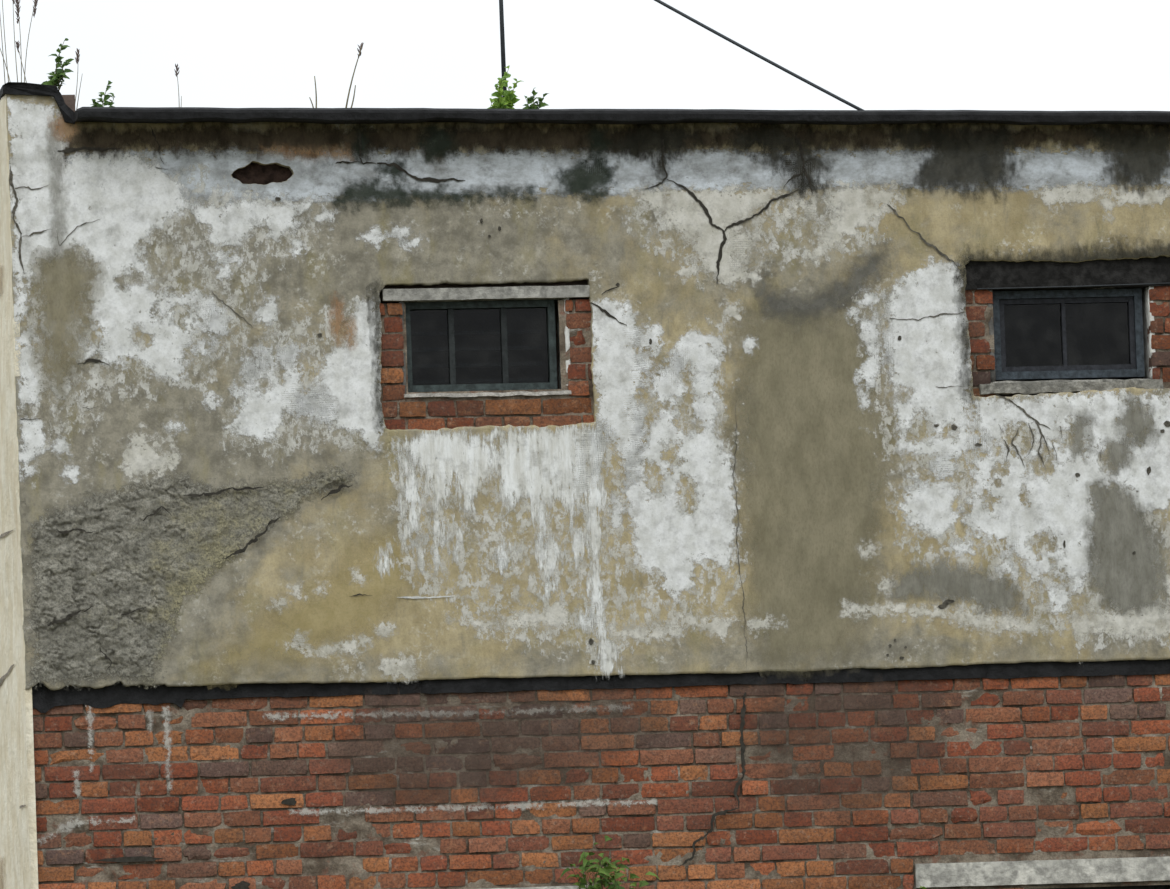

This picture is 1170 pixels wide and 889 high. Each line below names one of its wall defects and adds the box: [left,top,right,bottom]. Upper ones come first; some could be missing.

crack [336,129,465,183]
water stain [64,122,1170,208]
crack [645,132,816,284]
peeling [994,146,1170,221]
crack [889,312,967,321]
peeling [7,96,978,675]
peeling [840,255,1170,654]
crack [997,394,1063,469]
water stain [32,241,1170,795]
peeling [378,652,416,682]
water stain [290,803,542,816]
water stain [558,799,657,807]